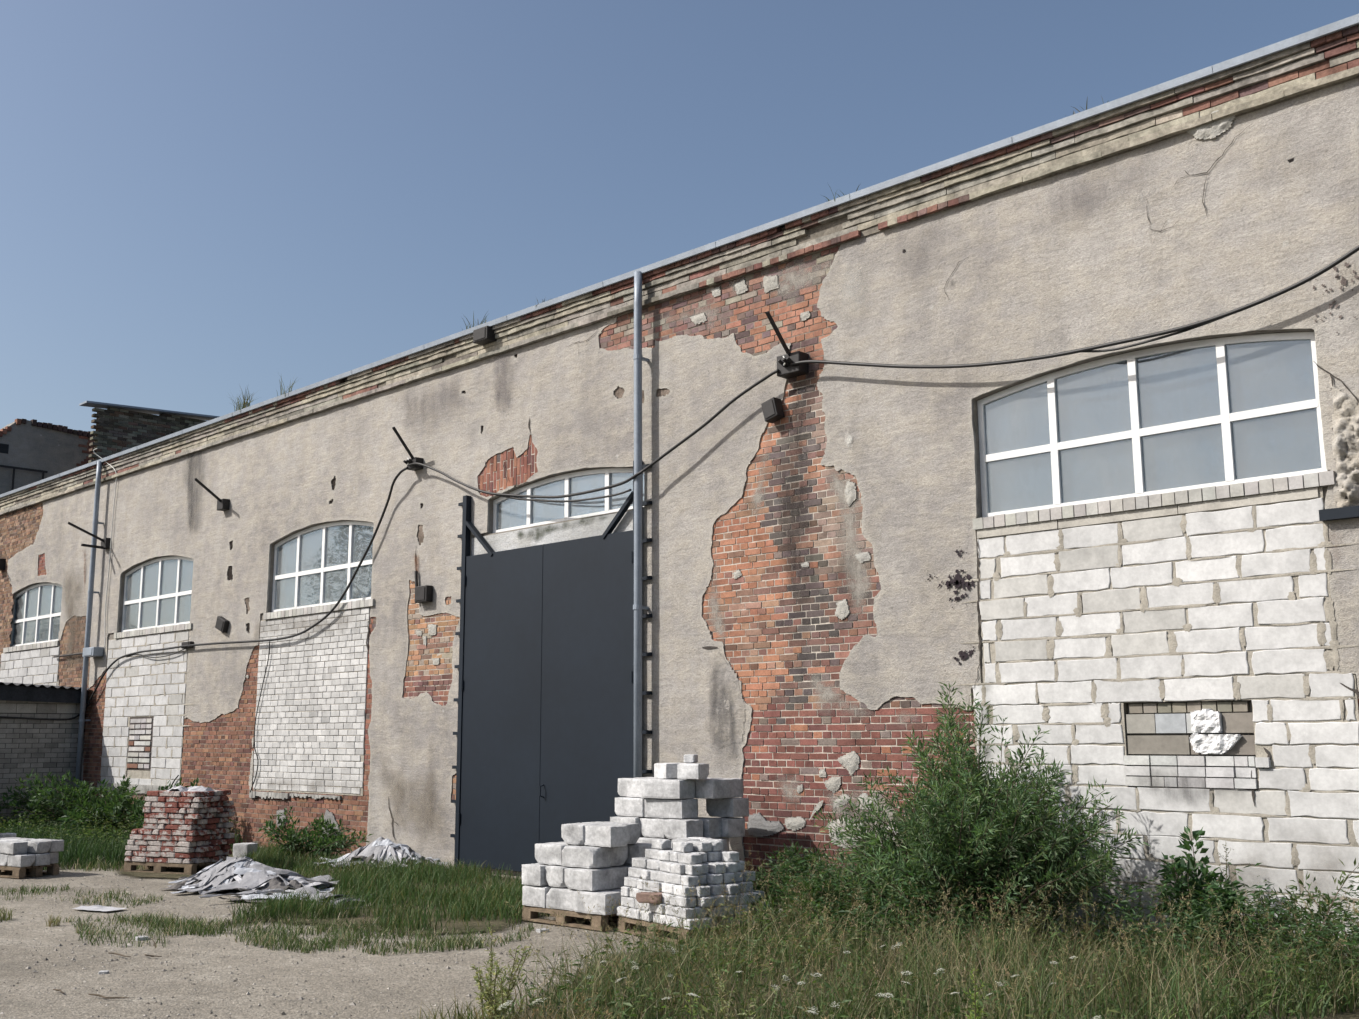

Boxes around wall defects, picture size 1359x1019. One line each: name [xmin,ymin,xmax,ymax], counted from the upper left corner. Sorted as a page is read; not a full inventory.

crack [1146,125,1250,232]
flaking render [478,435,538,497]
flaking render [0,503,47,666]
flaking render [58,616,113,801]
flaking render [181,598,376,856]
flaking render [403,580,460,706]
flaking render [599,246,976,900]